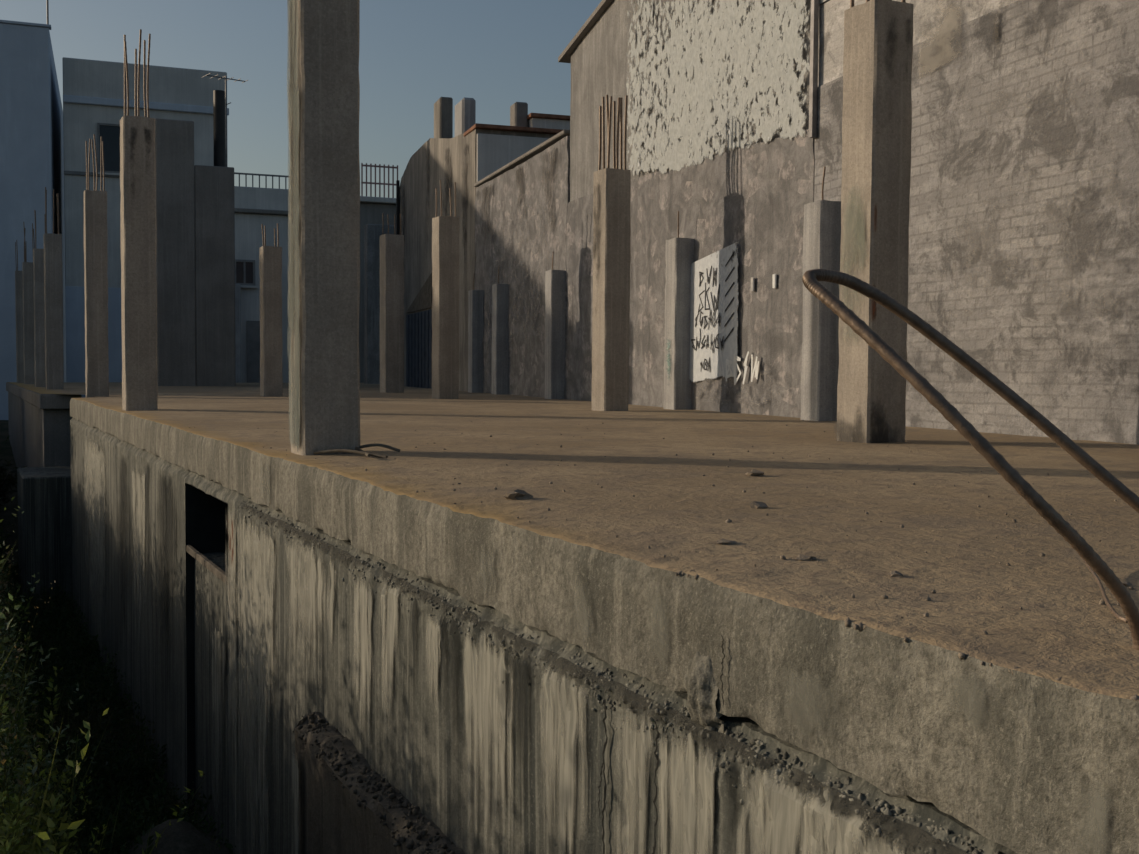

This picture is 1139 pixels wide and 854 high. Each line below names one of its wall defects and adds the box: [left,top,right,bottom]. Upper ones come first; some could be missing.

peeling [598,0,810,175]
water stain [84,440,176,661]
water stain [212,503,968,854]
crack [718,635,726,705]
crack [598,699,608,854]